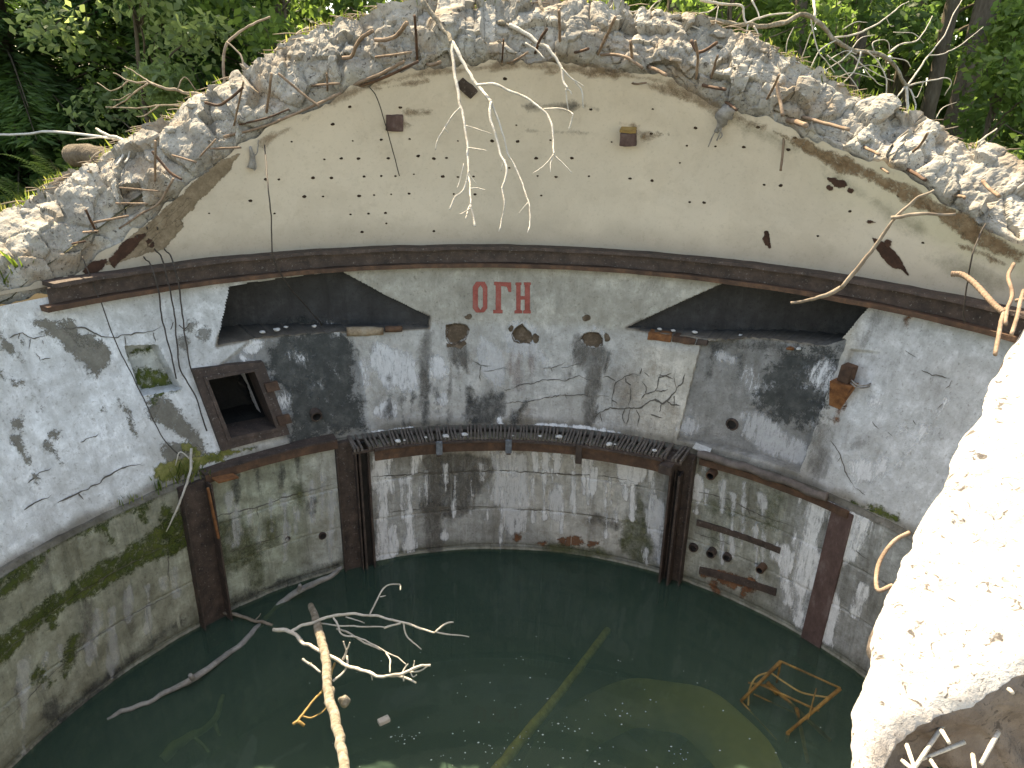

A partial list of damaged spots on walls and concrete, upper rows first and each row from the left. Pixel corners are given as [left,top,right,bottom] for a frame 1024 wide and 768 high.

spalling [0,0,1024,356]
rust [826,177,854,193]
damp [239,316,467,443]
crack [475,360,685,426]
damp [711,339,840,471]
damp [133,502,181,555]
damp [371,446,665,565]
rust [537,536,599,547]
damp [0,556,45,597]
damp [44,603,60,630]
damp [31,618,137,739]